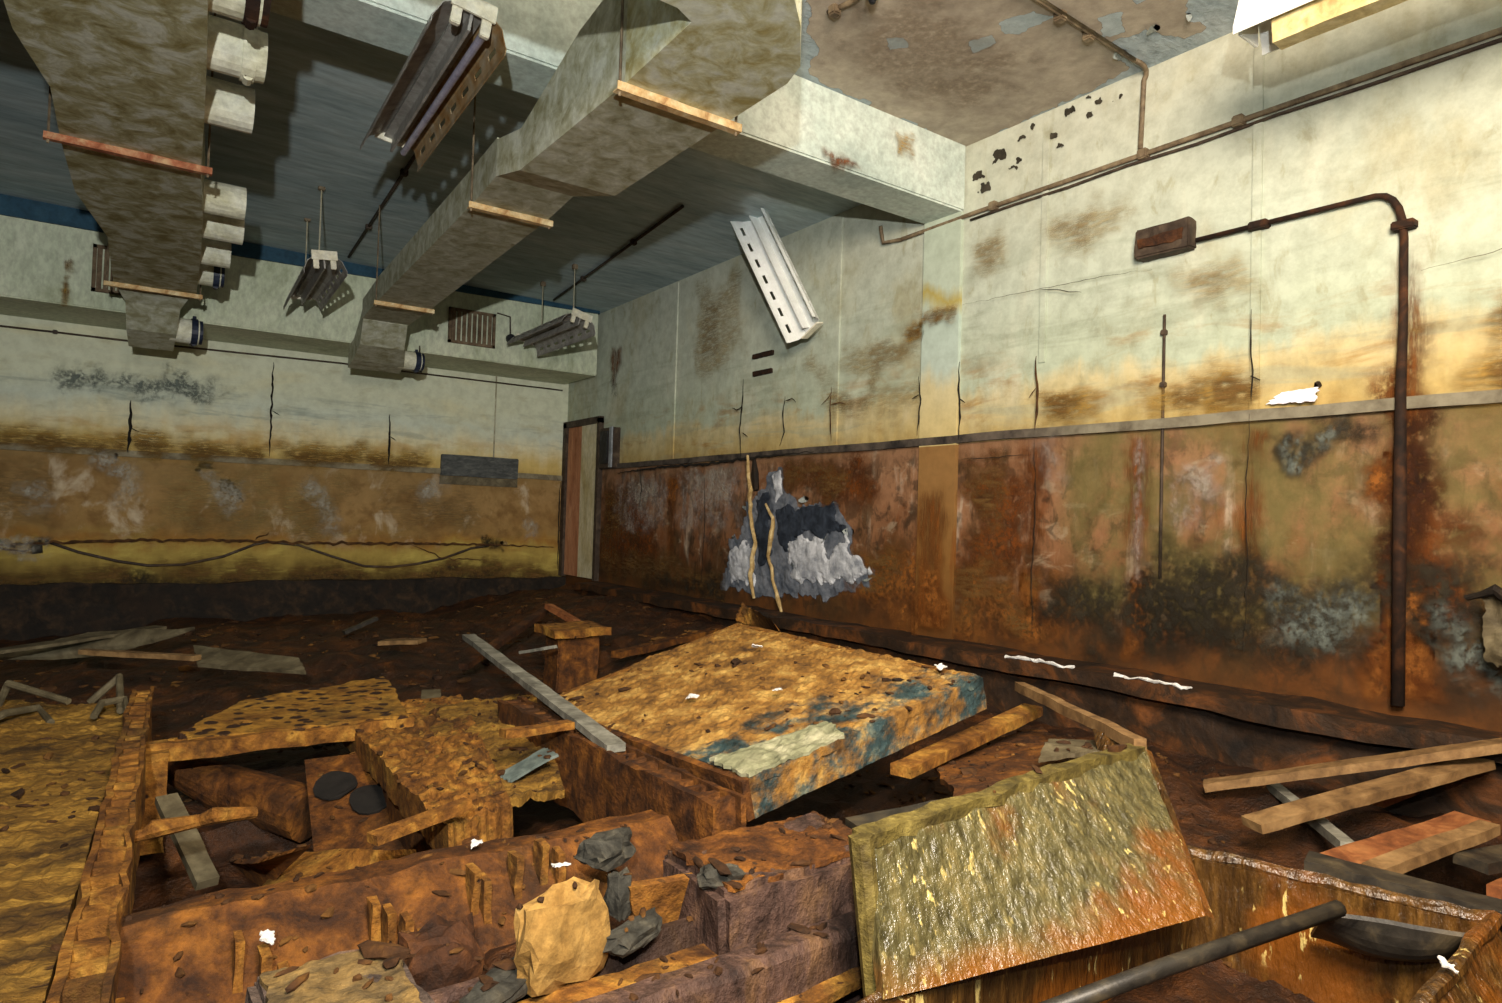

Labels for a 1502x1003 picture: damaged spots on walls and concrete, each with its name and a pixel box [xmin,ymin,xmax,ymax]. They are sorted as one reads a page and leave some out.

peeling [806,0,1206,194]
water stain [0,426,263,459]
water stain [67,374,209,399]
water stain [288,442,427,467]
water stain [1042,391,1095,423]
water stain [1148,370,1255,413]
corrosion [1365,296,1472,699]
spalling [720,455,875,612]
corrosion [859,549,917,620]
corrosion [953,562,1051,643]
water stain [1004,554,1502,690]